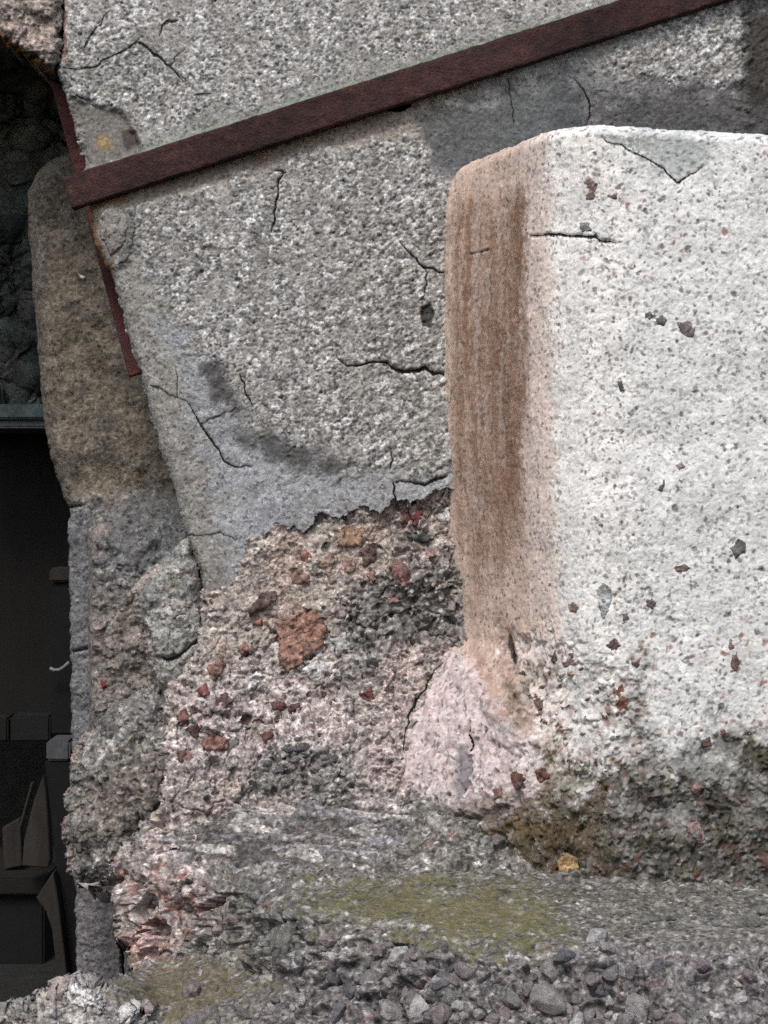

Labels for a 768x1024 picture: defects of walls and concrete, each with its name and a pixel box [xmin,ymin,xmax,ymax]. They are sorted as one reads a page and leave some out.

crack [63,12,209,100]
crack [574,78,703,184]
crack [271,170,286,232]
crack [530,233,615,243]
crack [338,359,444,376]
corrosion [450,195,522,503]
crack [149,369,253,468]
spalling [131,481,469,850]
crack [403,661,444,753]